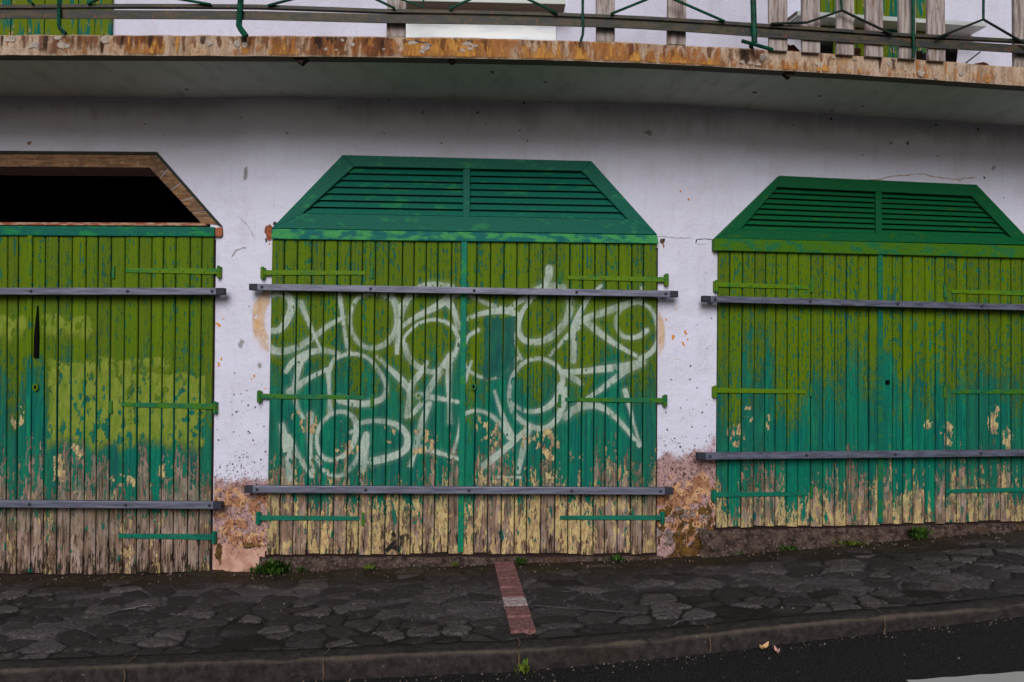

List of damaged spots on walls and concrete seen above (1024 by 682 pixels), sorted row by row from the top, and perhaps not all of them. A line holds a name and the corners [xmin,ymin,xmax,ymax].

rust [22,35,929,78]
crack [868,173,976,181]